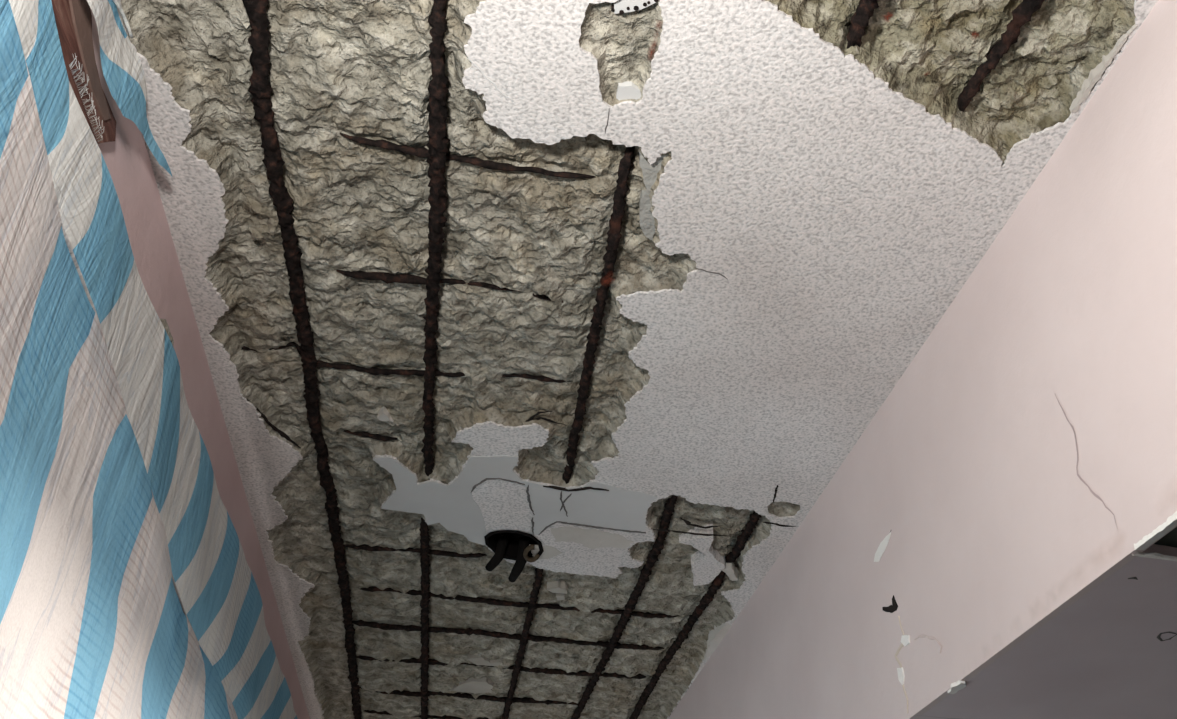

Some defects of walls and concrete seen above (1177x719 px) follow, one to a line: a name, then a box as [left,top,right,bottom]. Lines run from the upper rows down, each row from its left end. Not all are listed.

spalling [765,0,1138,165]
spalling [121,0,800,719]
crack [1055,395,1118,530]
spalling [1134,511,1177,550]